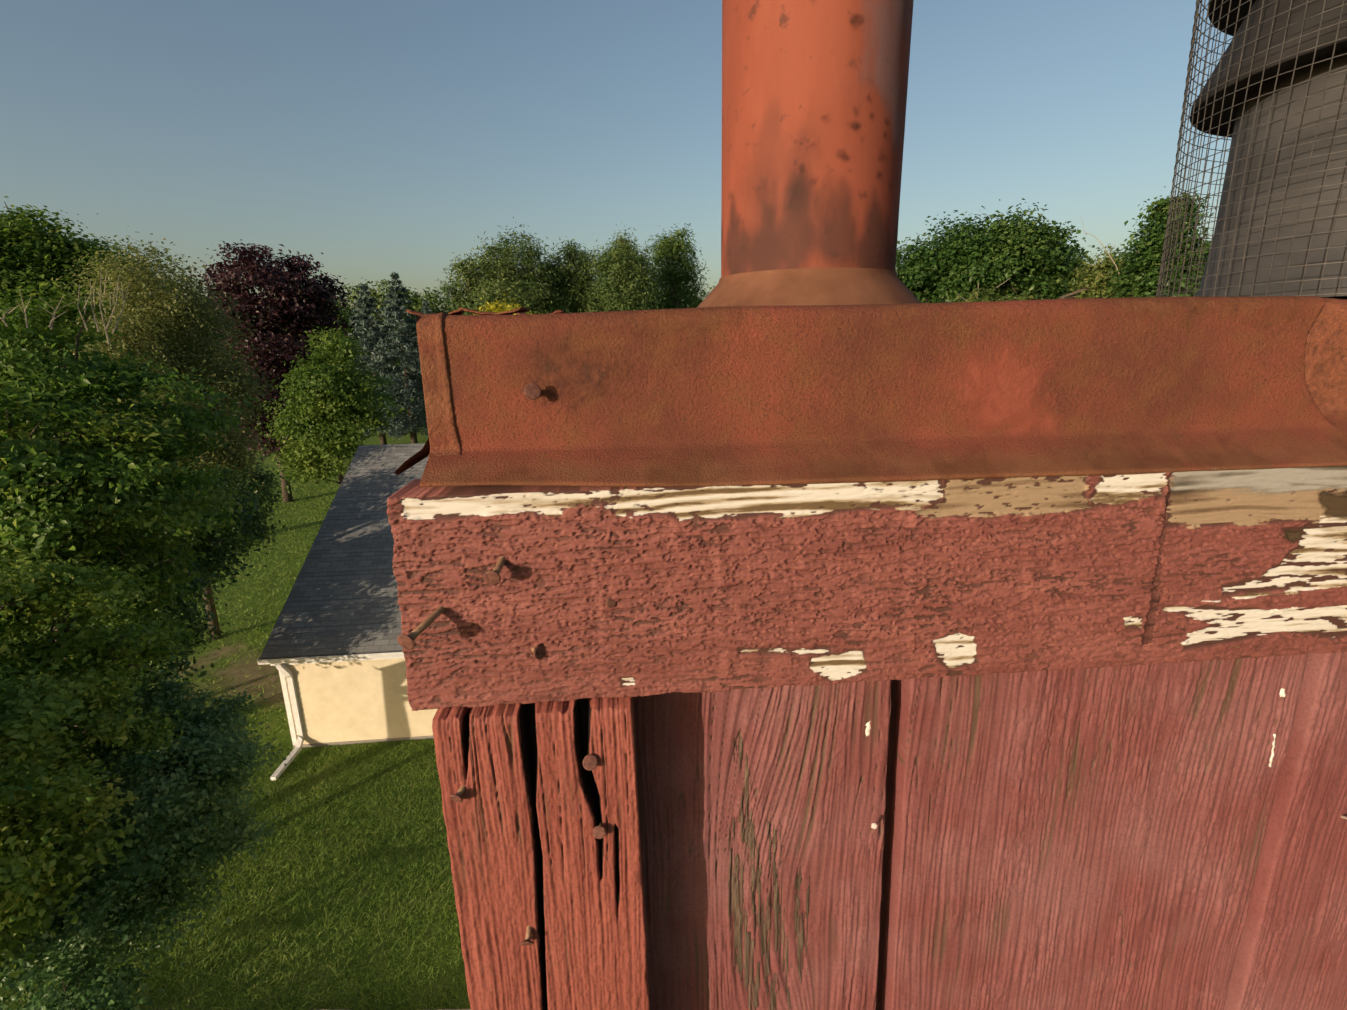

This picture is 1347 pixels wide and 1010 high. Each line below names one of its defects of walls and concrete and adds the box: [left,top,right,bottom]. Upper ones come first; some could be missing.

peeling [399,473,1347,647]
crack [461,708,471,779]
crack [519,703,548,1010]
crack [573,698,620,907]
peeling [737,648,867,681]
peeling [933,633,977,668]